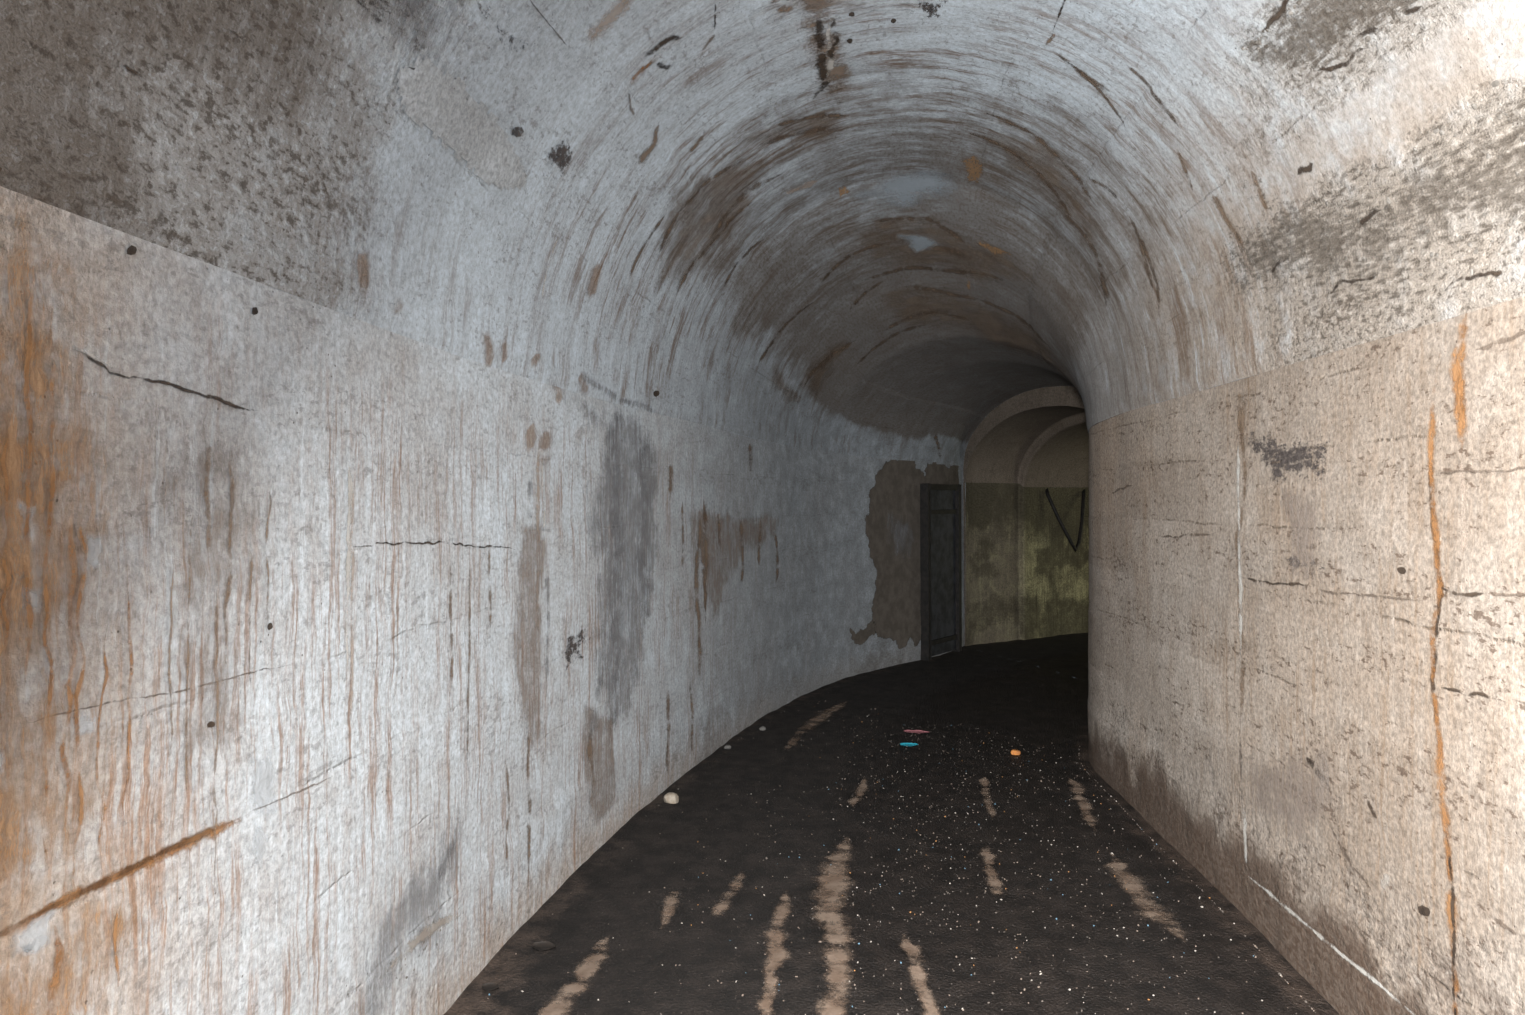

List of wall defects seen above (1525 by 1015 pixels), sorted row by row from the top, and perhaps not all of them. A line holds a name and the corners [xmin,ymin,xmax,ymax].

crack [771,0,854,95]
crack [81,351,248,410]
rust [0,226,109,884]
rust [99,600,133,845]
damp [514,460,549,776]
damp [565,377,779,817]
peeling [850,460,959,649]
crack [1163,404,1525,1015]
rust [1,907,124,1015]
crack [2,779,326,936]